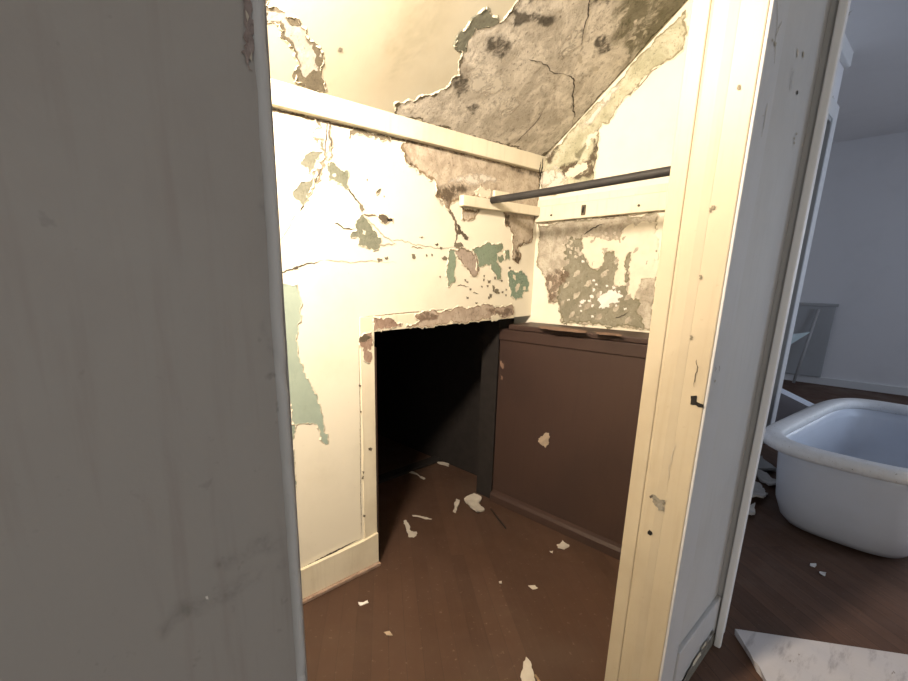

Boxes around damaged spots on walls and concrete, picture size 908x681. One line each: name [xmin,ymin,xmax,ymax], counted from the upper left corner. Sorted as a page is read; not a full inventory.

flaking render [266,0,327,93]
crack [282,189,468,273]
flaking render [348,0,689,364]
peeling [283,282,329,487]